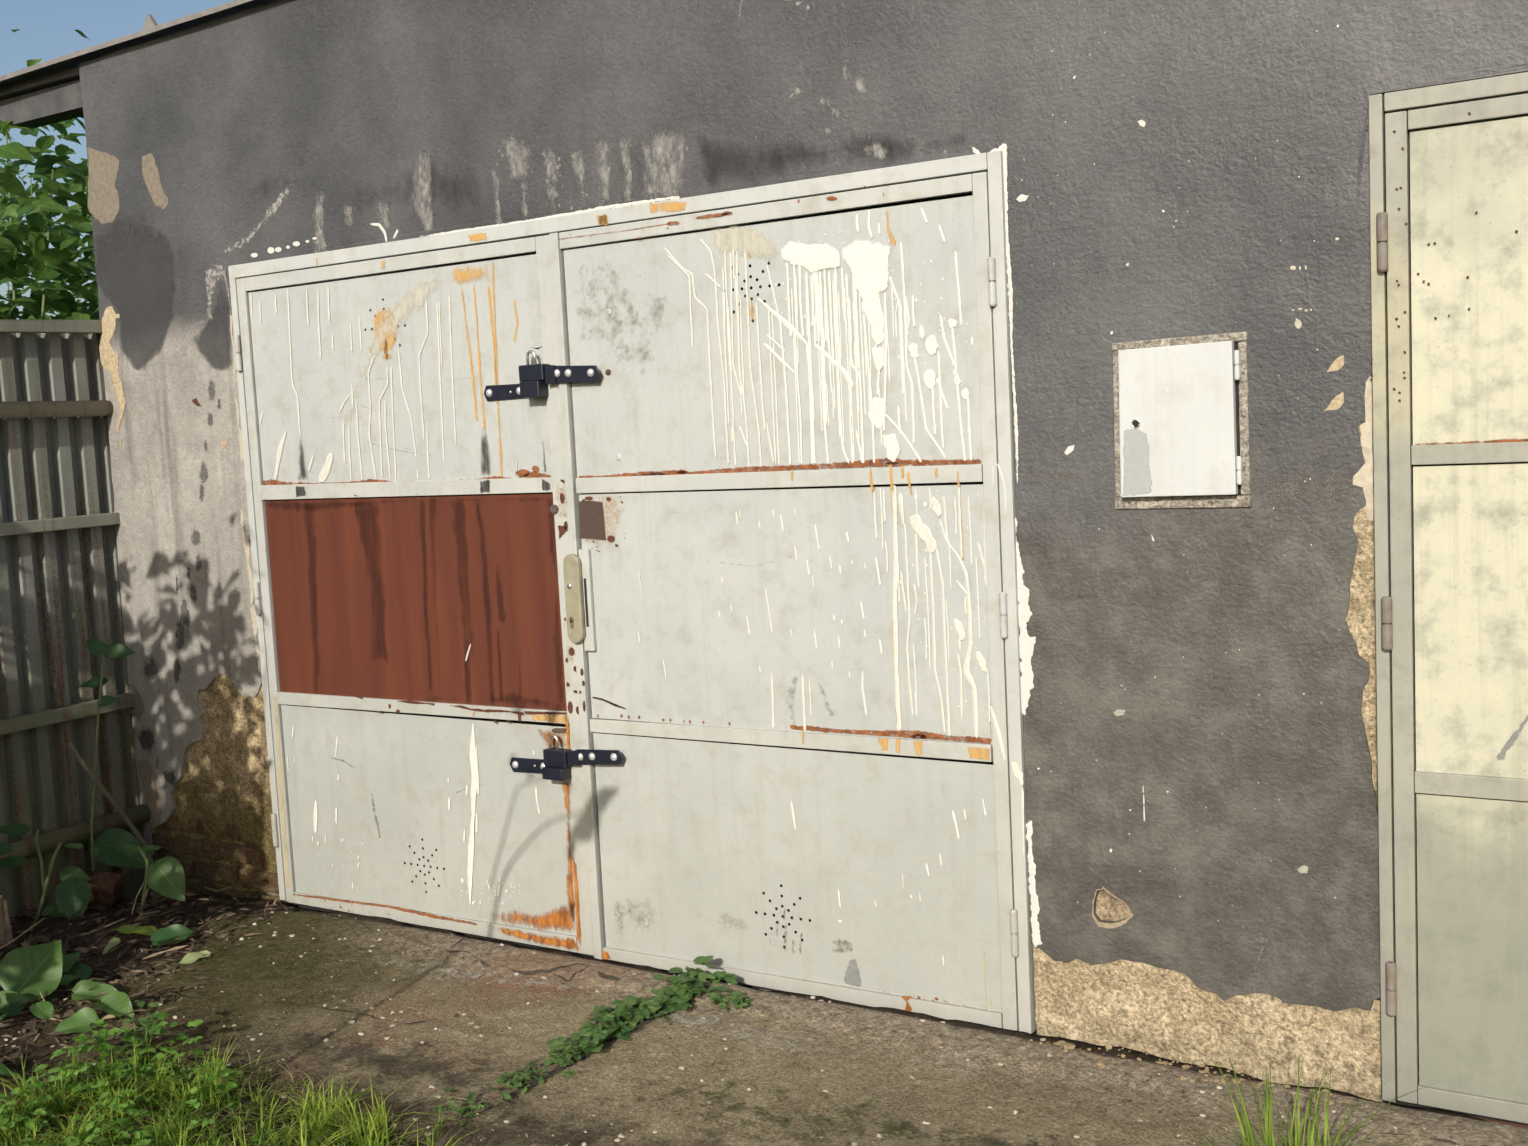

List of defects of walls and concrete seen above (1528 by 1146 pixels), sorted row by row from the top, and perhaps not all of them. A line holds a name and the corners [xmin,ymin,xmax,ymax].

water stain [415,154,432,231]
rust [562,202,732,239]
water stain [492,66,947,224]
water stain [95,222,231,501]
rust [455,263,562,490]
rust [578,458,981,561]
water stain [144,531,202,683]
flaking render [1346,376,1378,809]
flaking render [138,673,288,904]
rust [501,783,581,949]
flaking render [1092,887,1133,929]
flaking render [1033,945,1382,1102]